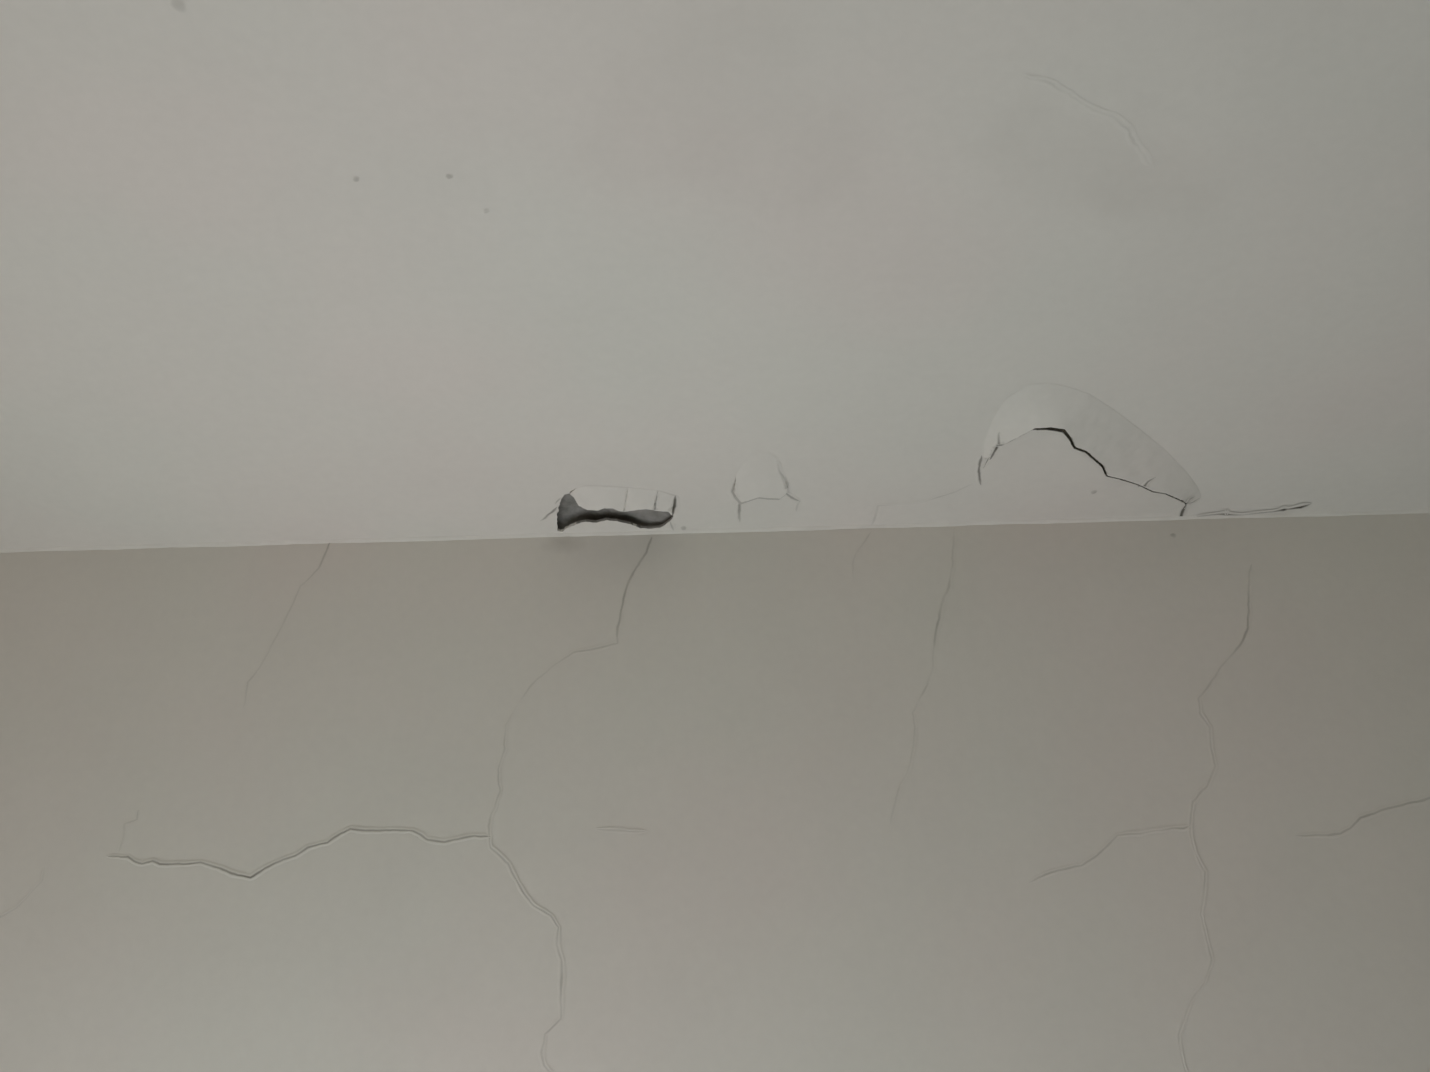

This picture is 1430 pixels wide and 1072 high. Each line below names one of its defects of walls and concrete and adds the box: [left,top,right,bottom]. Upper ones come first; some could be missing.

spalling [539,486,681,530]
crack [106,537,654,1072]